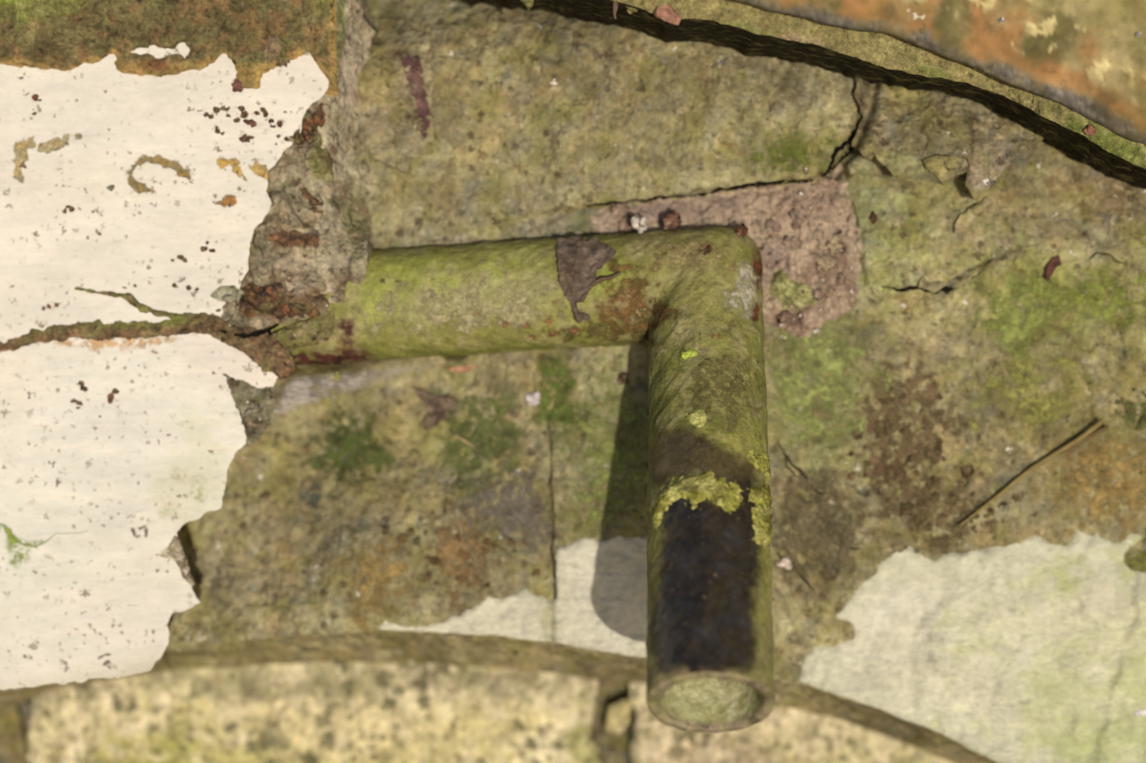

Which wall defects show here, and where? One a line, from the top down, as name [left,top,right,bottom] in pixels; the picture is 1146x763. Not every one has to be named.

peeling [0,0,341,353]
rust [203,105,289,145]
crack [586,129,857,207]
spalling [852,77,1043,234]
crack [0,287,294,380]
rust [291,321,367,367]
rust [596,259,677,340]
spalling [223,373,276,446]
crack [0,523,86,564]
peeling [379,536,648,658]
water stain [650,429,760,673]
water stain [774,469,855,579]